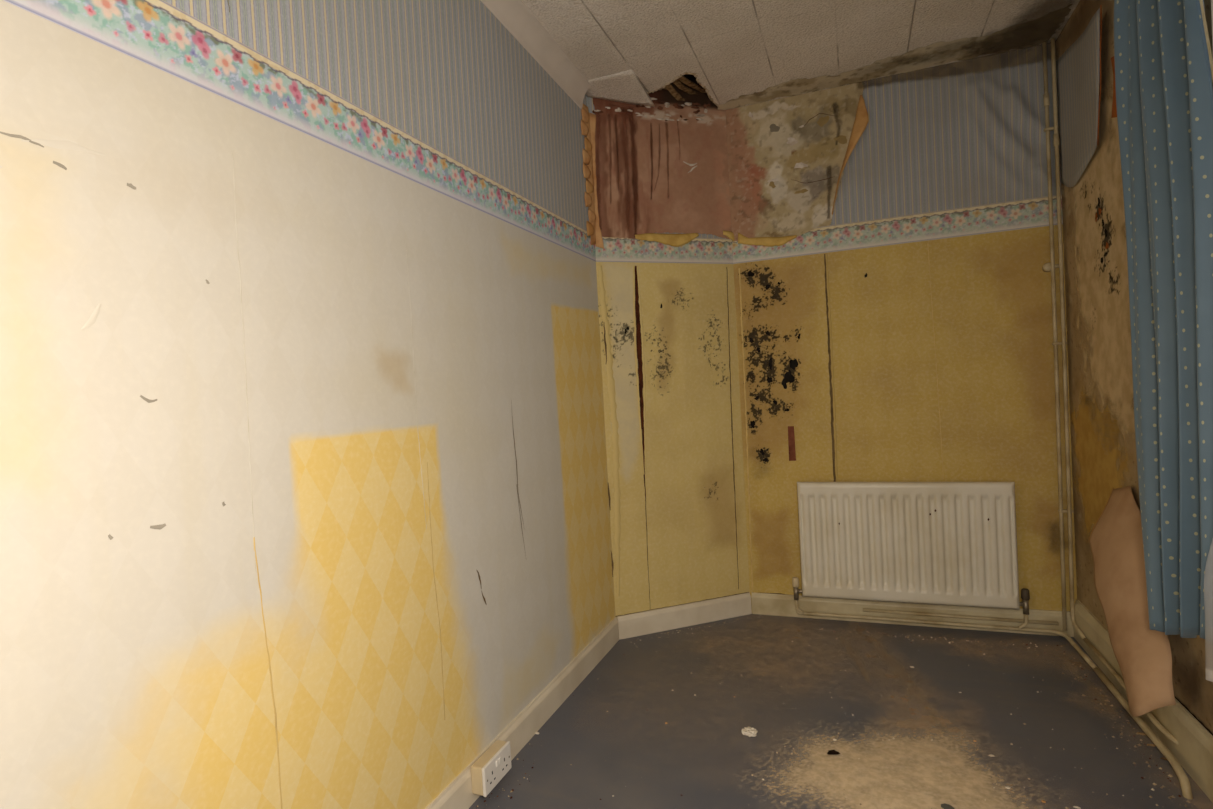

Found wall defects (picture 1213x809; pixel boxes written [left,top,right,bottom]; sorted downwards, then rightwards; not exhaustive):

leakage [857,0,1106,89]
flaking render [581,80,863,249]
mould [1081,183,1120,294]
leakage [688,255,832,586]
leakage [14,224,693,809]